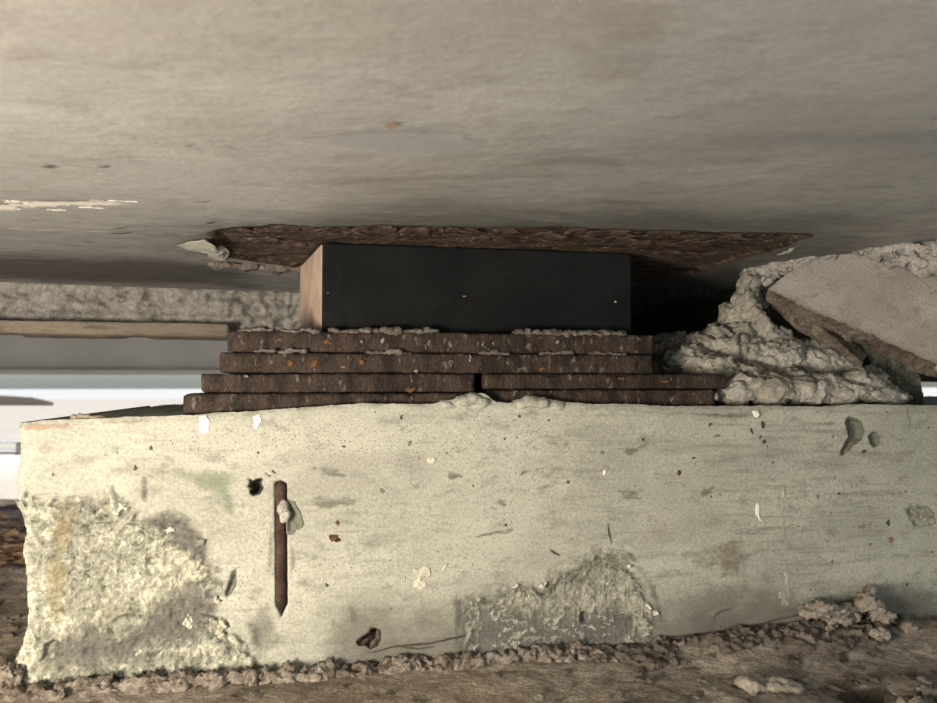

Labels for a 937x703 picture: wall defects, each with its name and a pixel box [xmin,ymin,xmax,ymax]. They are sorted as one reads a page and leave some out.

peeling [0,199,137,211]
spalling [177,224,813,283]
spalling [841,417,880,456]
spalling [0,487,256,687]
rust [274,481,291,615]
spalling [460,549,659,652]